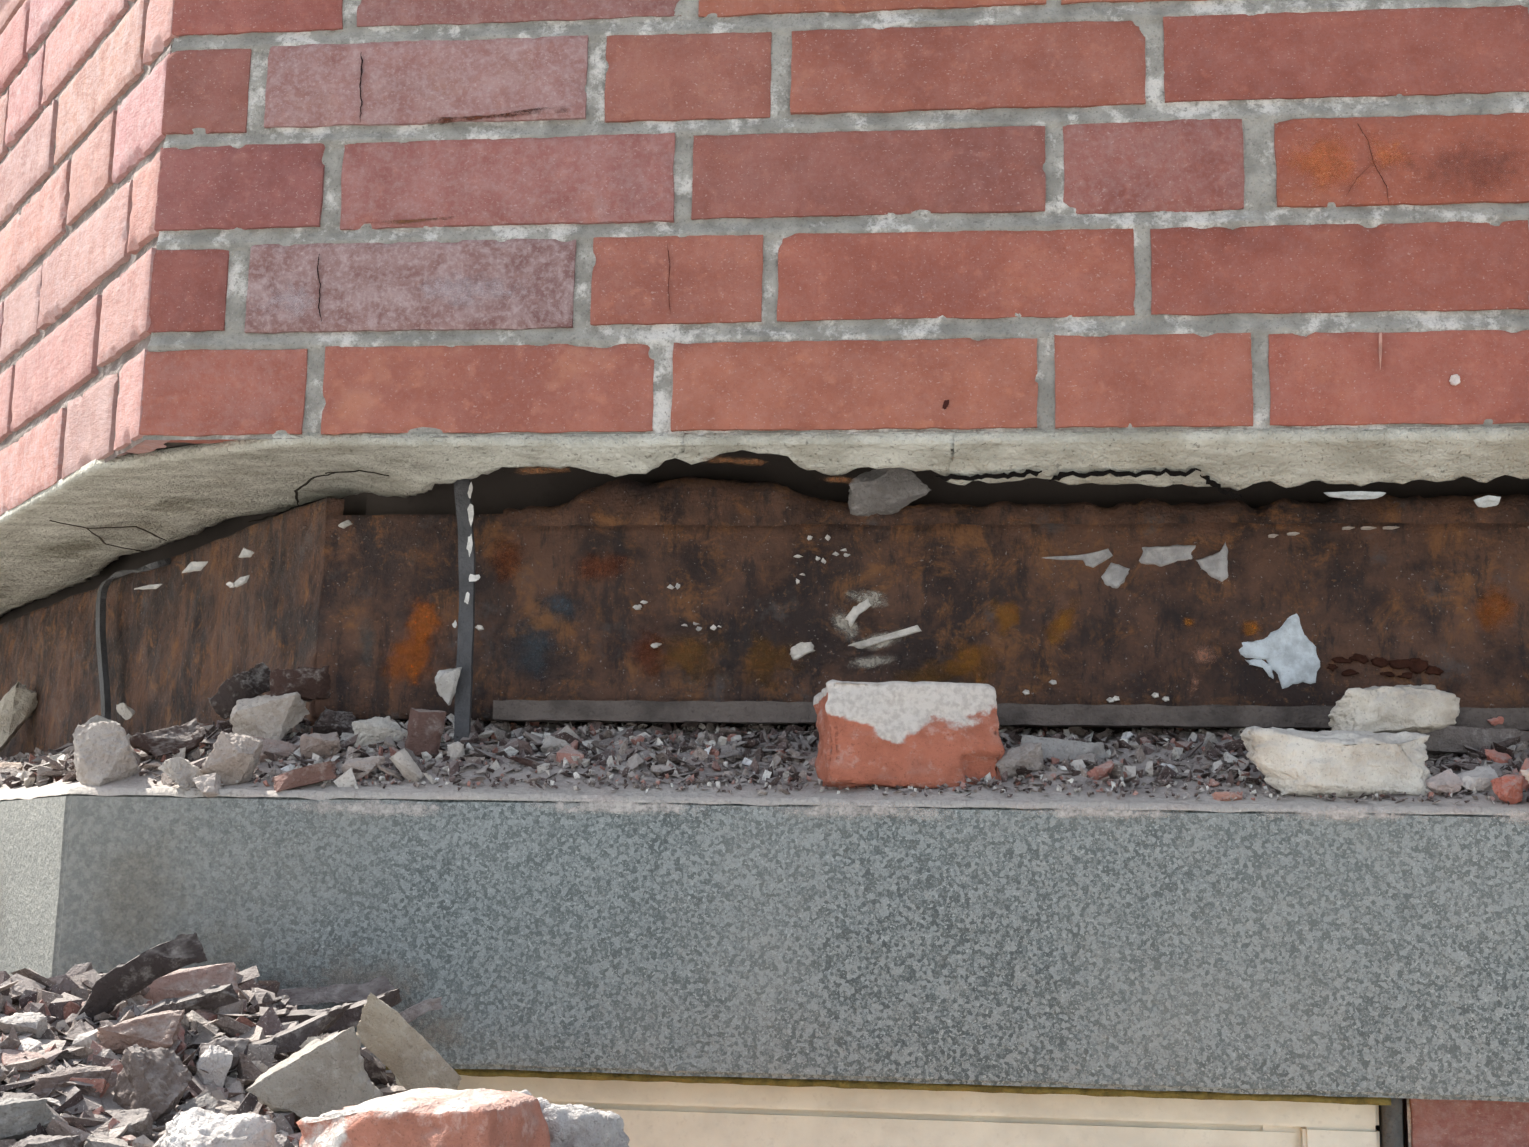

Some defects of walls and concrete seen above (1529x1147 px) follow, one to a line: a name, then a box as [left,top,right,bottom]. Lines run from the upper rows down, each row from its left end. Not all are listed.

crack [1346,123,1389,202]
spalling [703,457,764,465]
crack [249,470,389,522]
peeling [1325,491,1386,500]
peeling [1474,495,1501,508]
crack [50,520,167,552]
peeling [1043,542,1228,588]
peeling [1239,613,1444,689]
corrosion [208,662,271,719]
corrosion [129,718,206,759]
corrosion [1424,725,1529,755]